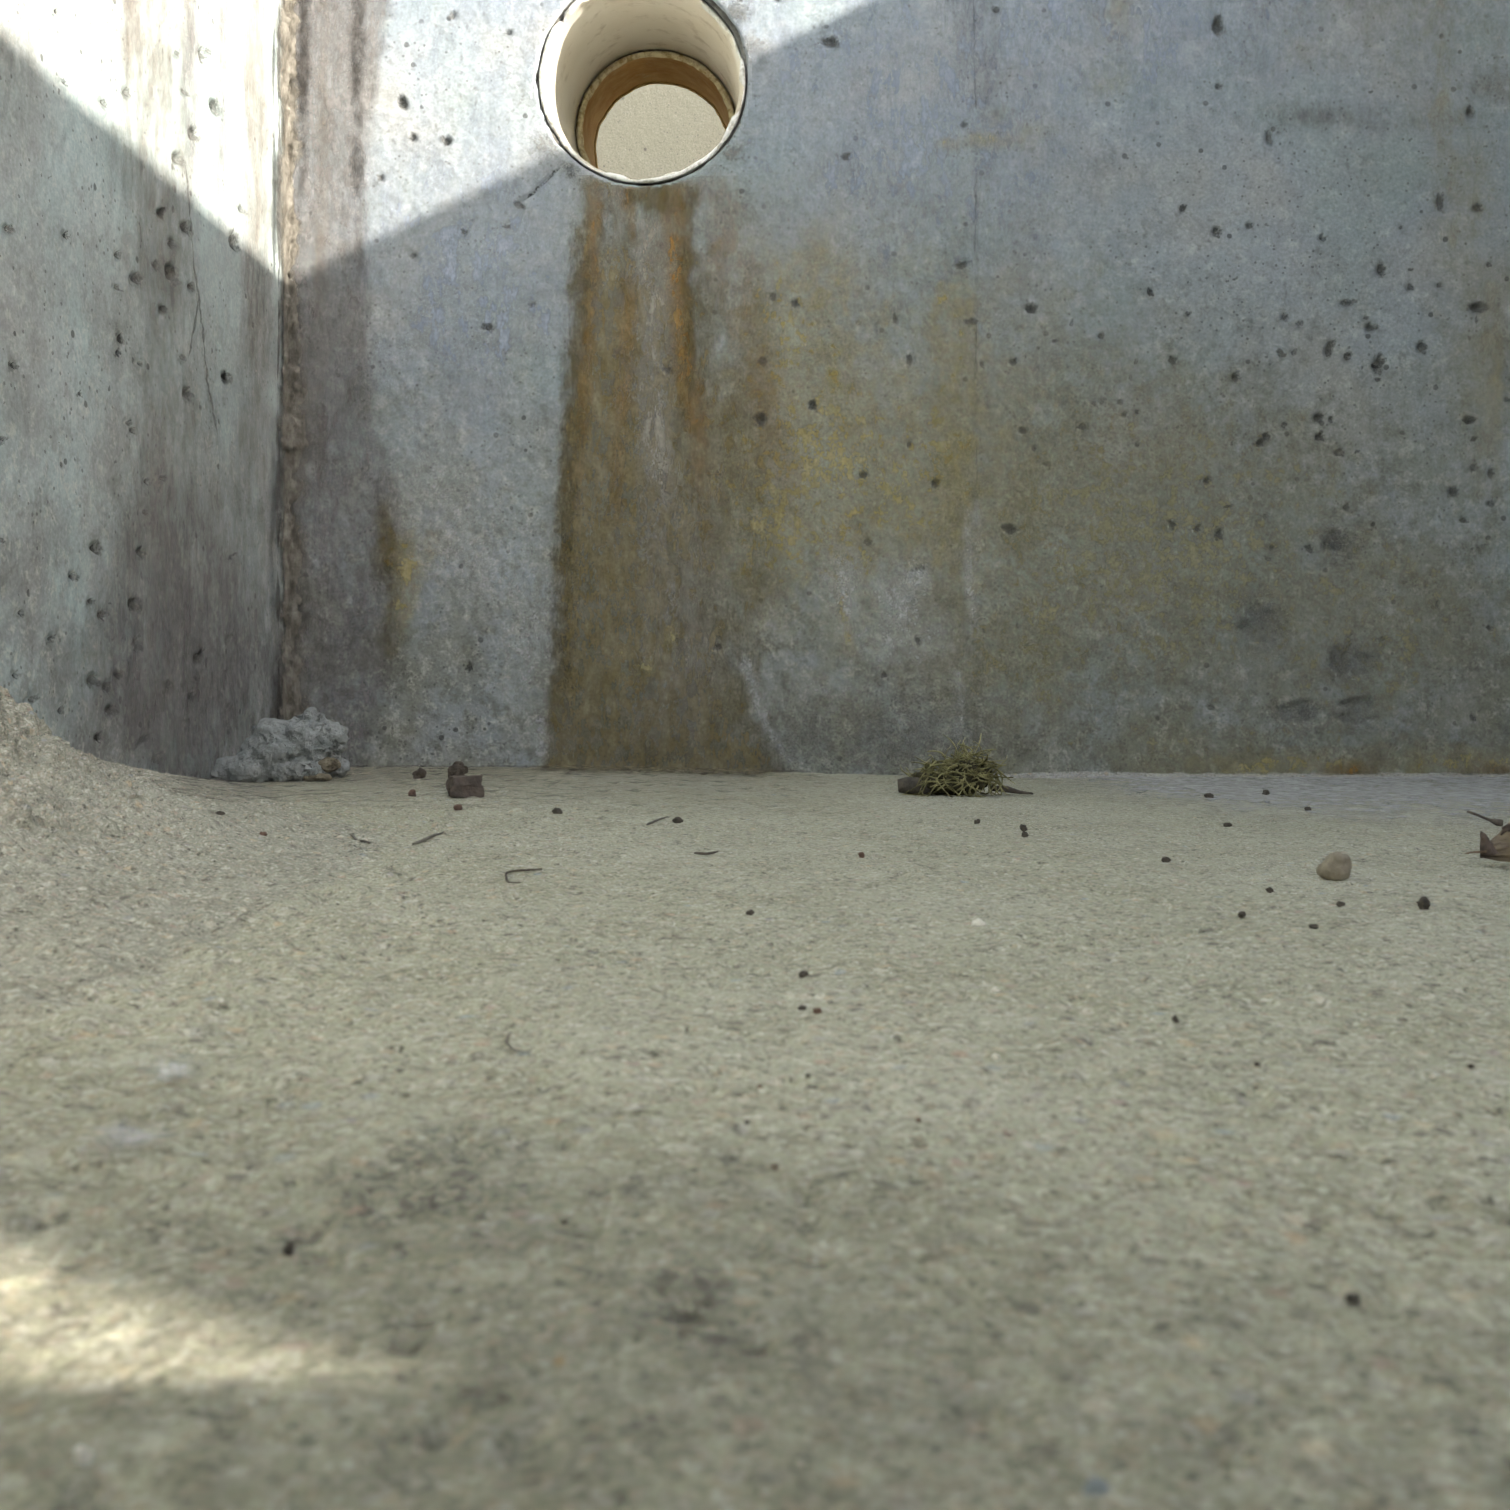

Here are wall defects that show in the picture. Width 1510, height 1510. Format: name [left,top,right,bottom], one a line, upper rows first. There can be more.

crack [274,0,282,719]
corrosion [545,81,777,775]